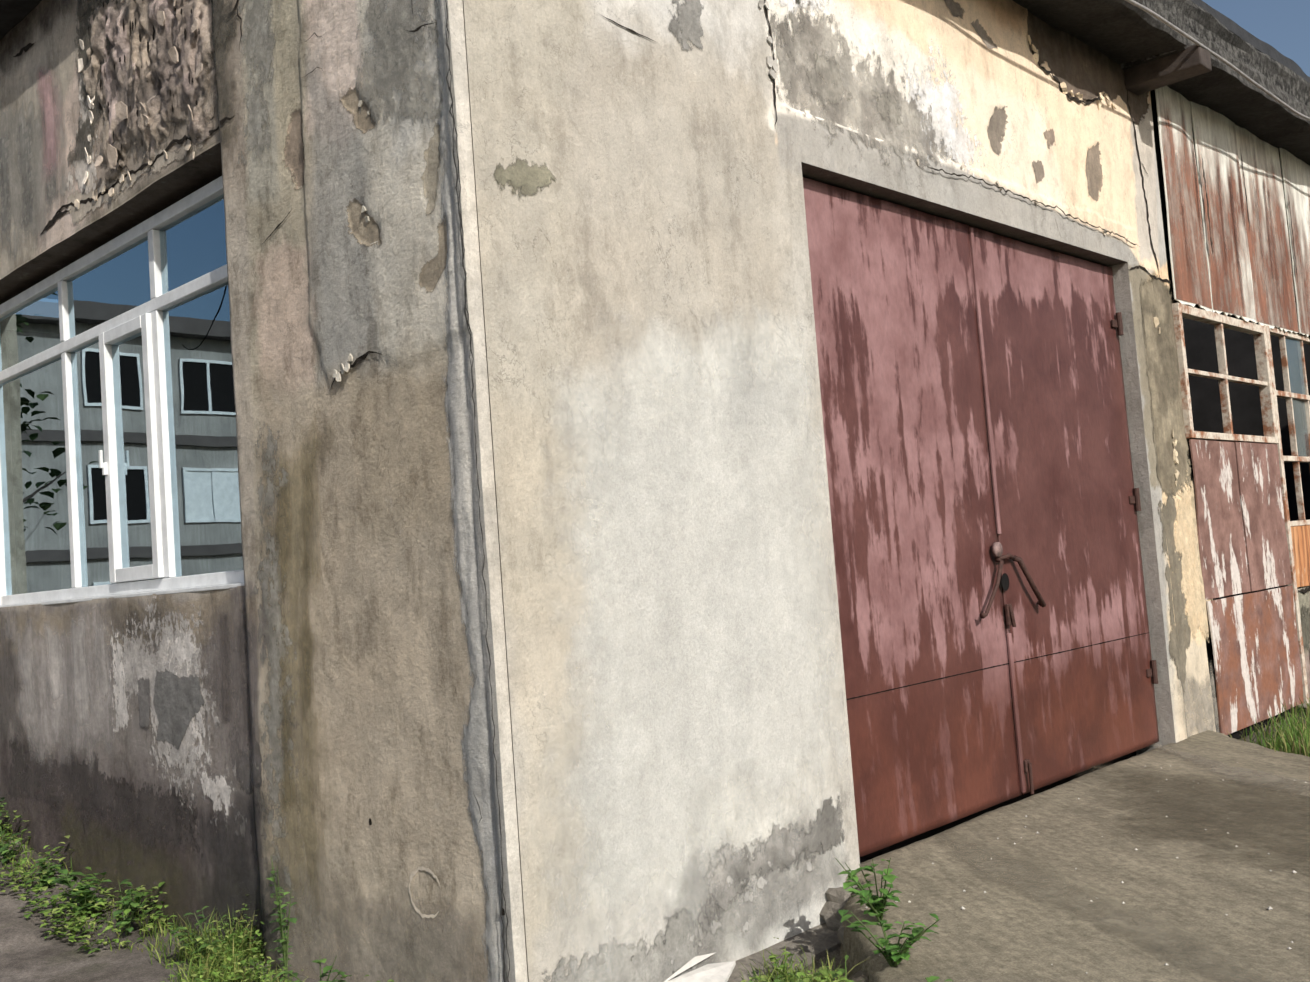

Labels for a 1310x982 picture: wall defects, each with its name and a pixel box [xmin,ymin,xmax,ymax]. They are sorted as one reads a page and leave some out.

spalling [67,39,203,224]
crack [40,107,234,235]
spalling [341,87,376,134]
spalling [346,198,381,247]
spalling [419,123,448,293]
peeling [770,0,1008,185]
rust [1163,112,1310,335]
peeling [109,596,252,841]
water stain [0,424,467,982]
water stain [543,796,845,982]